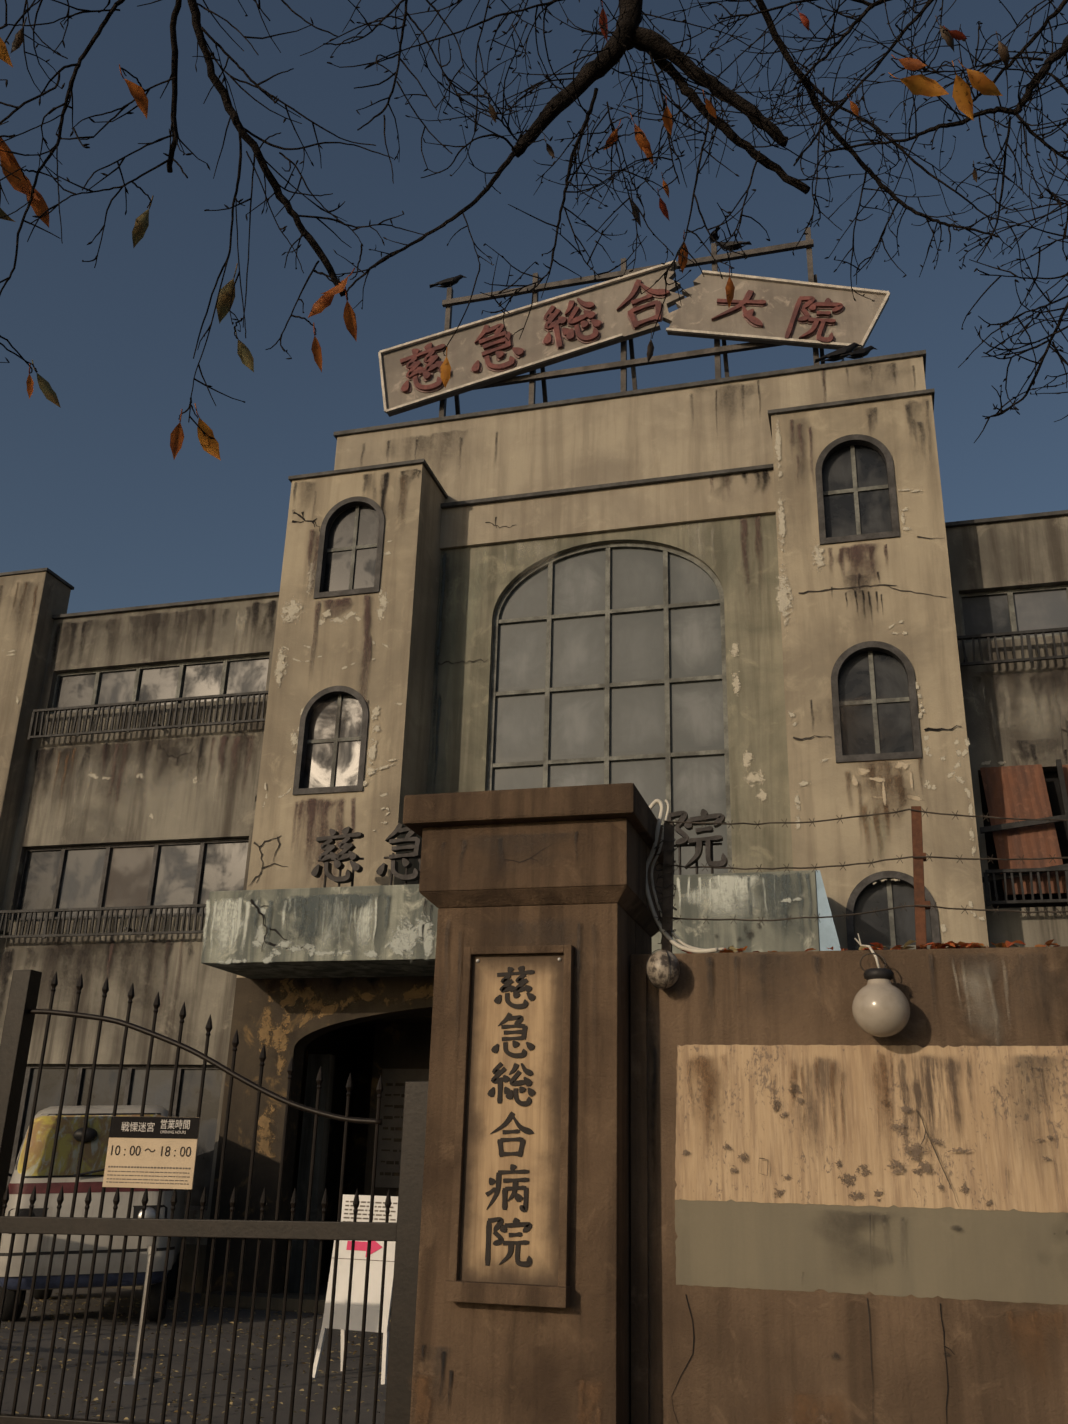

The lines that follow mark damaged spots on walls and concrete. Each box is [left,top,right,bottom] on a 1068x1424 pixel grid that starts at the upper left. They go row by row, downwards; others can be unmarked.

damp [831,572,882,606]
crack [799,584,943,597]
peeling [730,643,741,694]
damp [35,733,252,788]
peeling [742,750,767,802]
peeling [851,735,976,857]
crack [250,836,305,949]
peeling [218,900,434,964]
peeling [258,978,434,1076]
peeling [256,1105,275,1158]
crack [671,1294,695,1422]
crack [940,1303,955,1421]